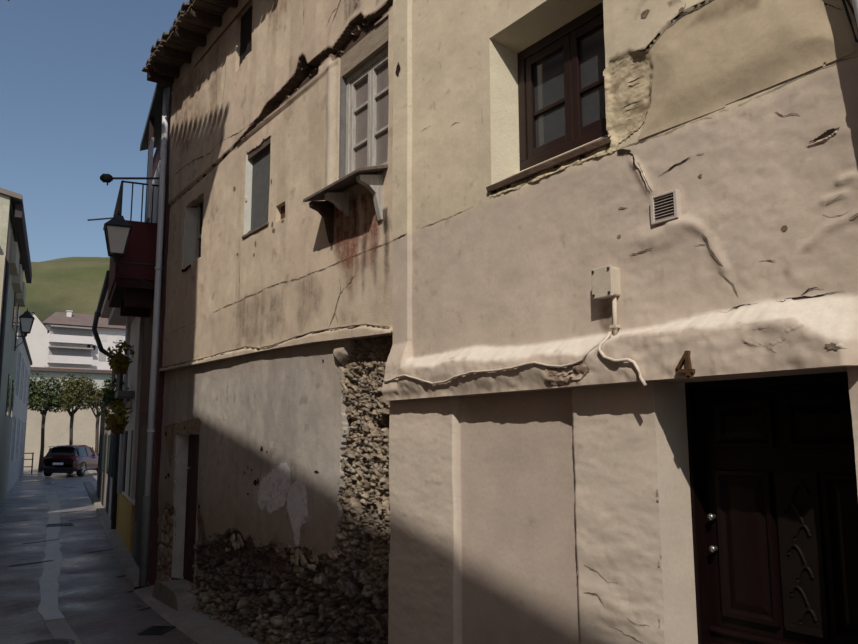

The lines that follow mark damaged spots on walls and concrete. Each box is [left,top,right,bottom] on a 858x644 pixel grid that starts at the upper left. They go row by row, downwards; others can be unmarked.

crack [629,0,712,55]
flaking render [489,49,652,198]
crack [617,56,857,190]
rust [333,194,378,267]
crack [173,233,407,366]
crack [699,235,756,308]
crack [779,287,842,302]
flaking render [544,361,590,385]
flaking render [187,335,393,644]